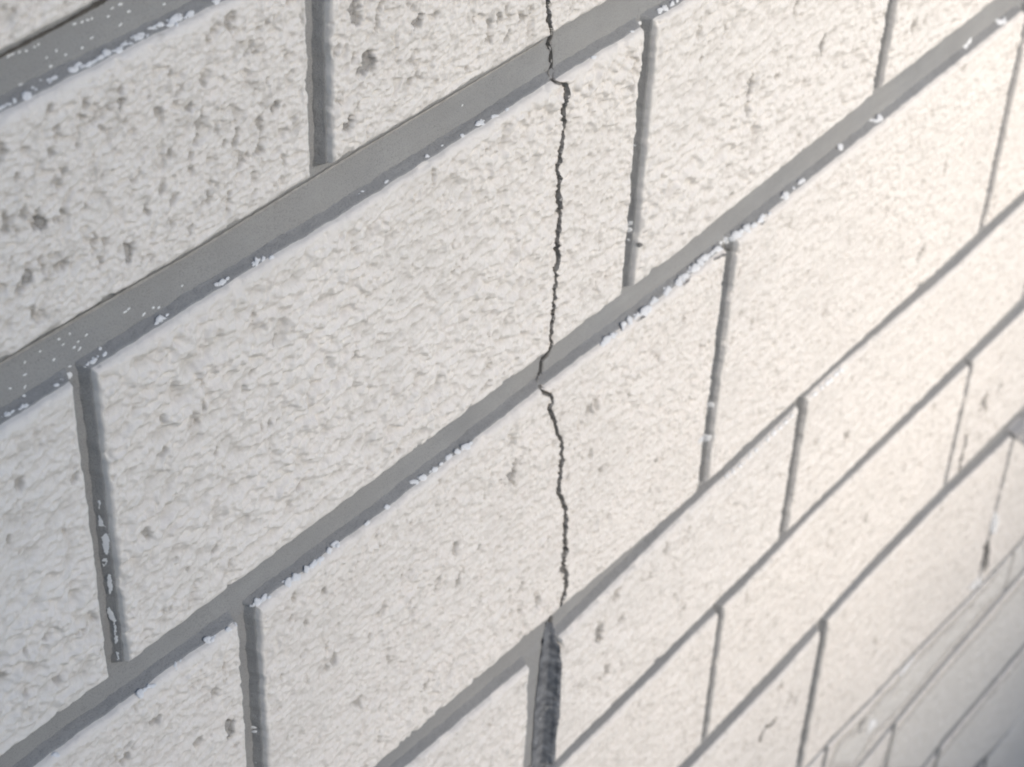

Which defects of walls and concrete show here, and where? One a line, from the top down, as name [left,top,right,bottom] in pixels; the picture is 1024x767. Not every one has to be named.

crack [0,0,571,643]